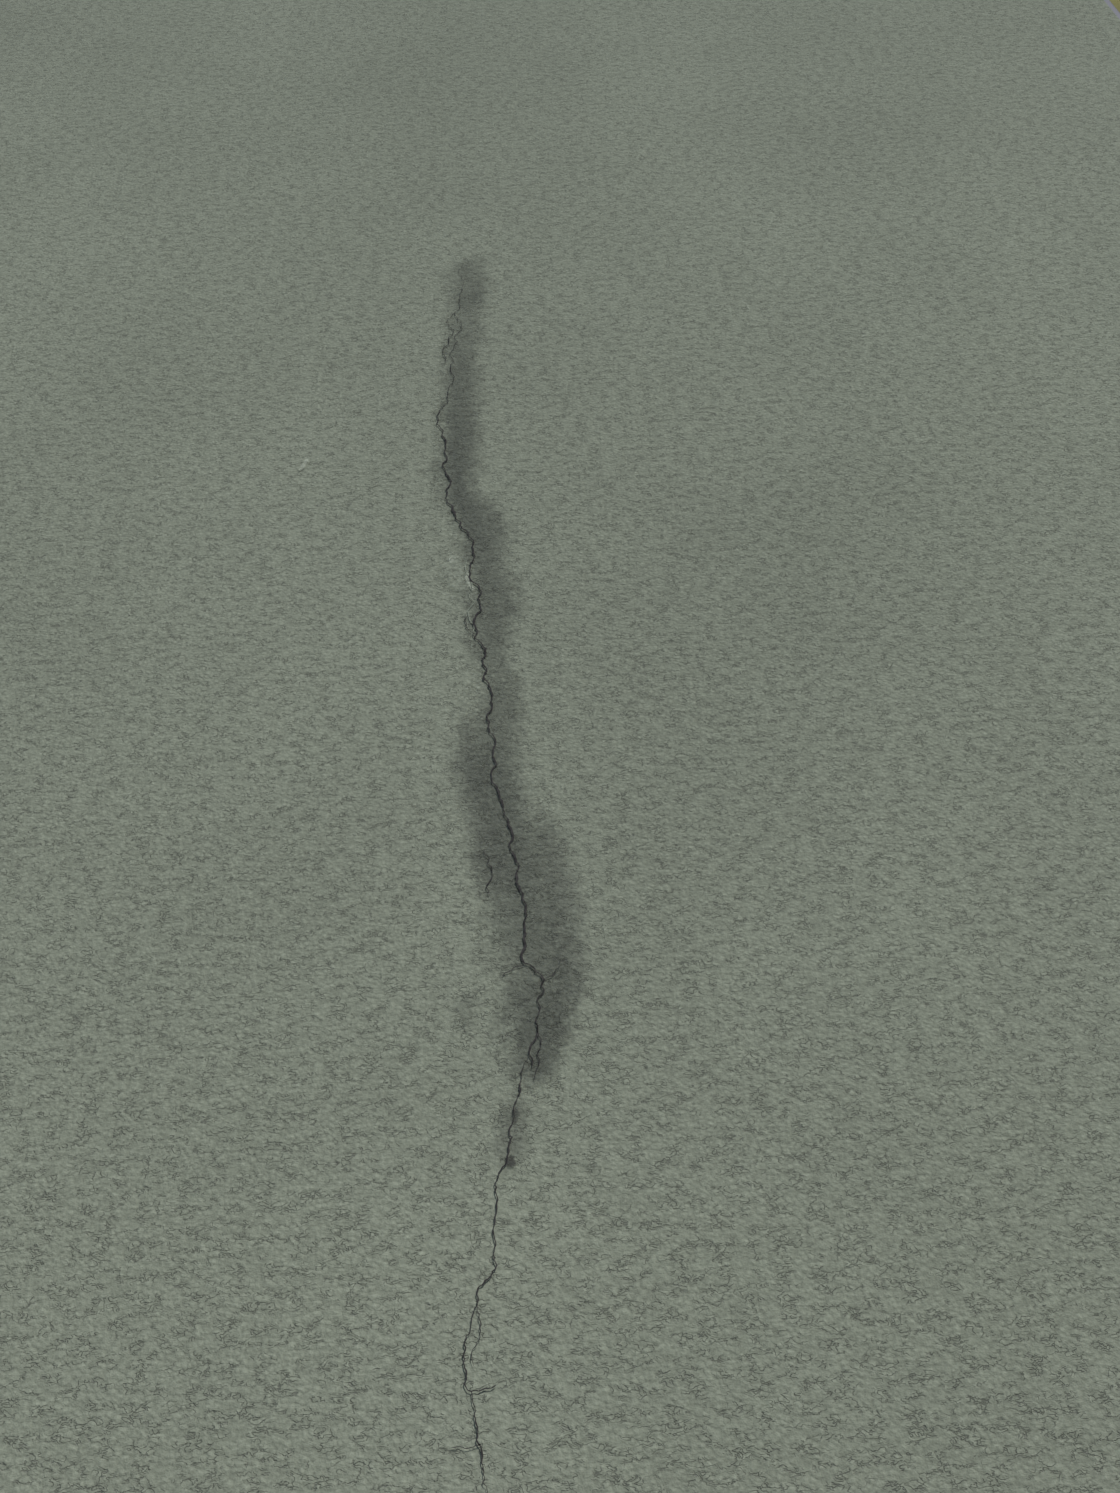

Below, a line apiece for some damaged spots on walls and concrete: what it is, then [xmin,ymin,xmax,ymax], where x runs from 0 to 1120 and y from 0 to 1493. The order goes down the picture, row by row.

crack [436,265,560,1493]